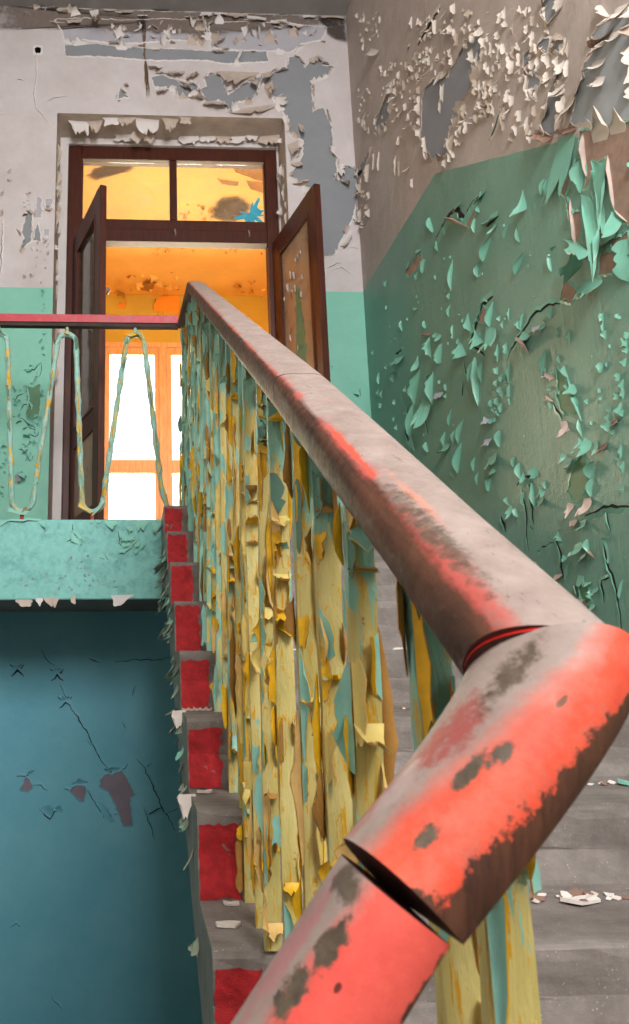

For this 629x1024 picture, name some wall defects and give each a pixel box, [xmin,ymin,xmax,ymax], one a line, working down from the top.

peeling [0,145,63,311]
peeling [24,0,629,305]
peeling [0,329,79,528]
peeling [15,555,134,608]
peeling [76,329,173,643]
peeling [111,272,399,942]
peeling [375,249,517,492]
crack [499,457,571,580]
crack [585,504,629,629]
crack [10,648,114,772]
crack [39,805,63,820]
crack [137,758,179,838]